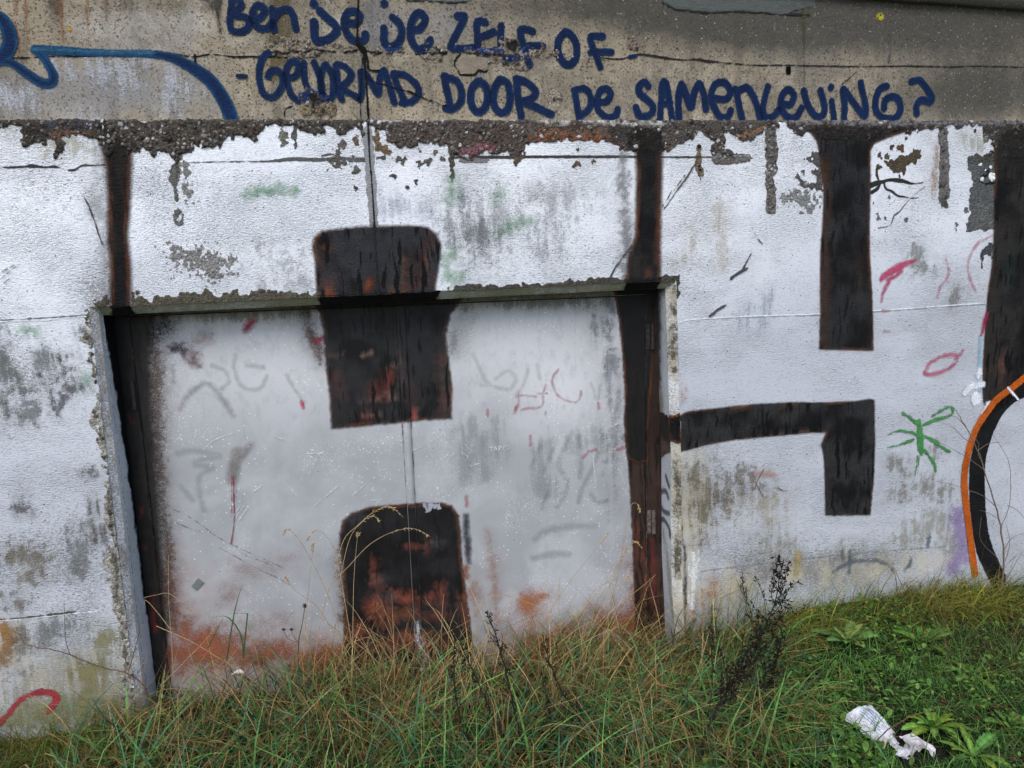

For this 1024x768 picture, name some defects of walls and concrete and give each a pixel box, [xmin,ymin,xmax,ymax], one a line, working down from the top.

crack [175,53,287,63]
crack [356,0,448,119]
crack [454,53,488,76]
crack [600,53,1024,85]
spalling [0,85,1024,214]
damp [667,285,679,373]
damp [0,346,85,428]
spalling [80,241,321,716]
damp [0,541,52,611]
rust [161,545,345,677]
rust [509,558,648,666]
damp [663,459,764,622]